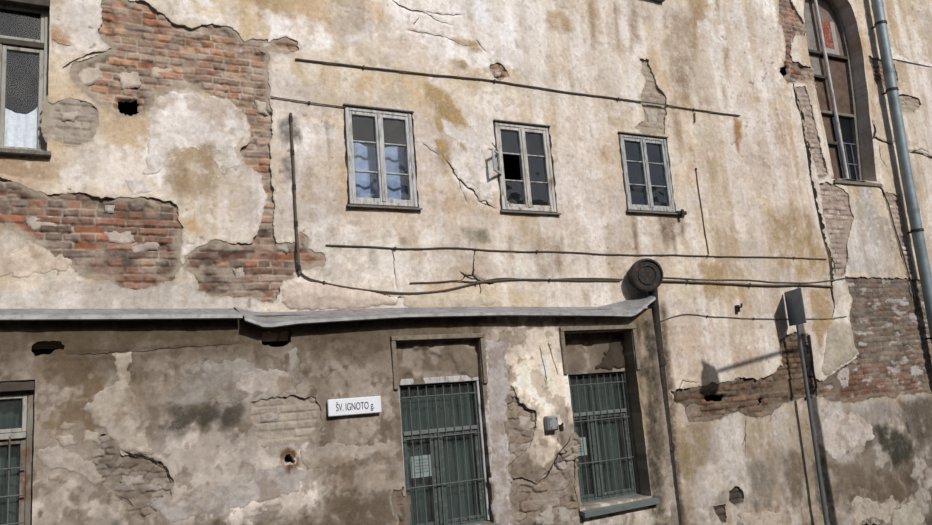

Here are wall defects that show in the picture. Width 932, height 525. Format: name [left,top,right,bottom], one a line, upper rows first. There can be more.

crack [394,1,485,50]
flaking render [636,59,666,138]
flaking render [0,0,326,303]
crack [424,144,497,209]
flaking render [671,0,932,460]
flaking render [37,341,398,525]
flaking render [485,340,513,525]
water stain [878,426,912,465]
water stain [901,399,932,439]
water stain [301,498,394,525]
flaking render [713,486,792,525]
flaking render [846,491,931,525]